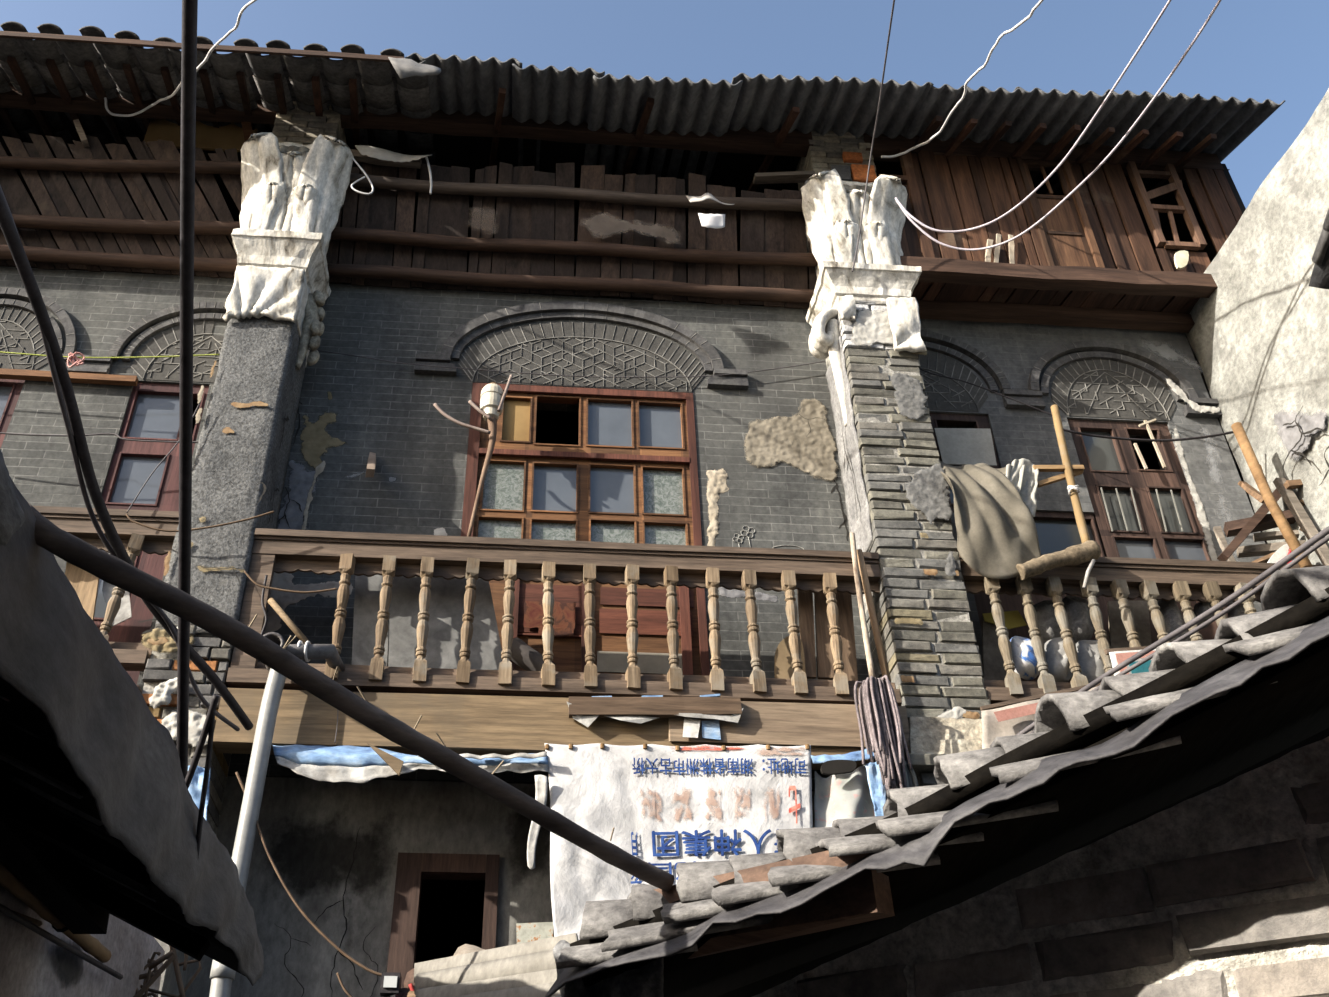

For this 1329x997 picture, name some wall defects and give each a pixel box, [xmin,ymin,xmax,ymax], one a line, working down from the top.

flaking render [277,391,346,530]
crack [1282,406,1329,485]
flaking render [706,469,729,546]